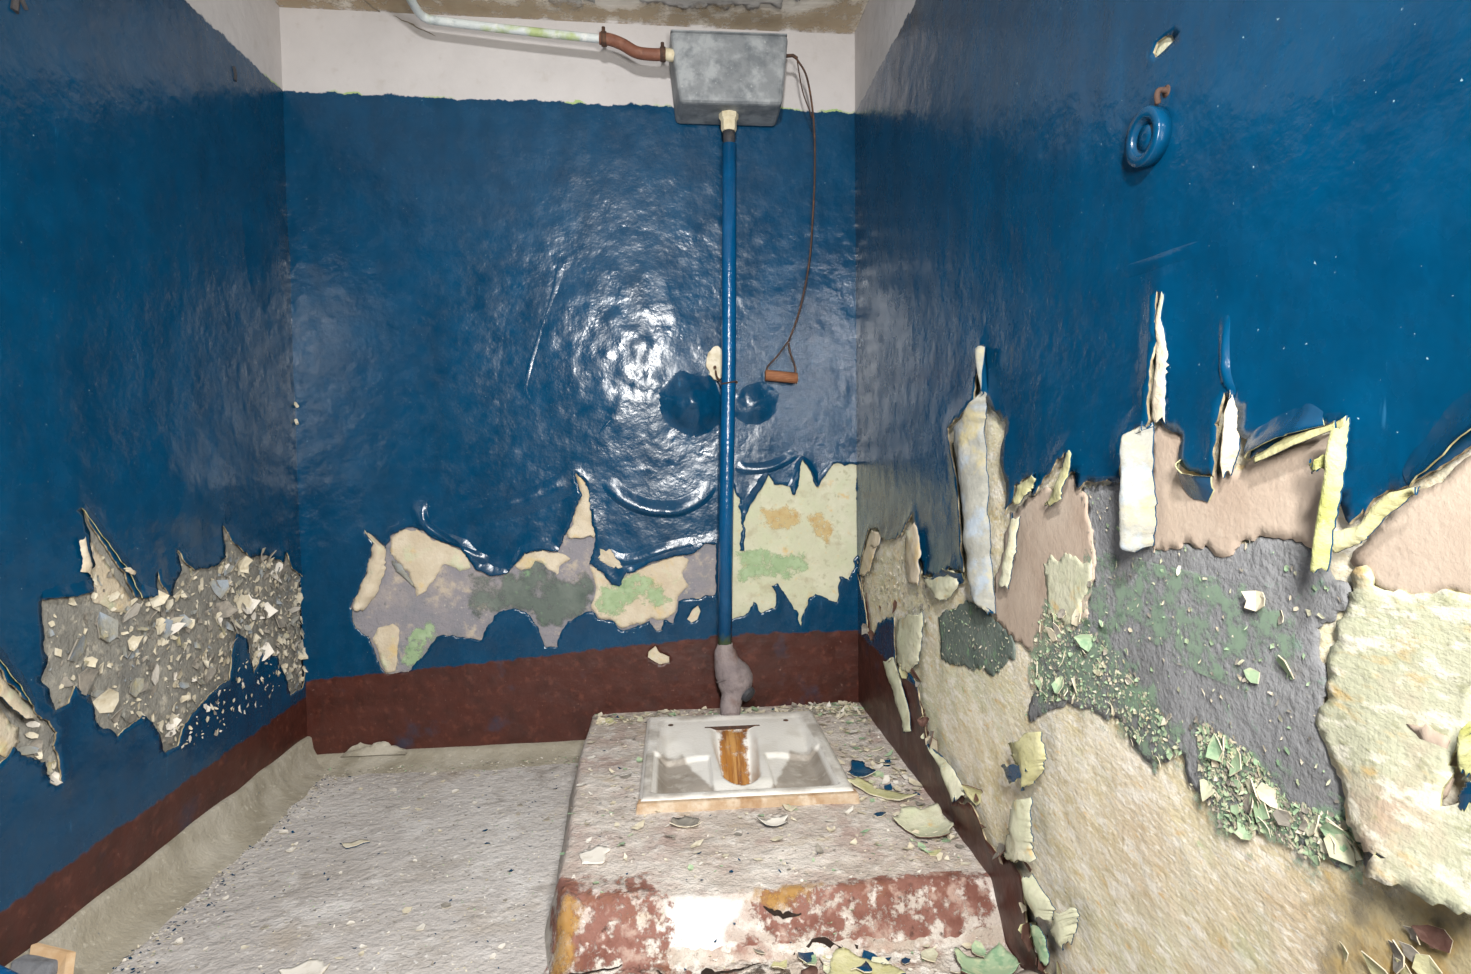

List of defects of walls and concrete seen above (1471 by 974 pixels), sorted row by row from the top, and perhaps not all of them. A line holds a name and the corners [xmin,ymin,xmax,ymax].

spalling [640,0,800,11]
peeling [0,504,308,786]
peeling [351,292,1471,974]